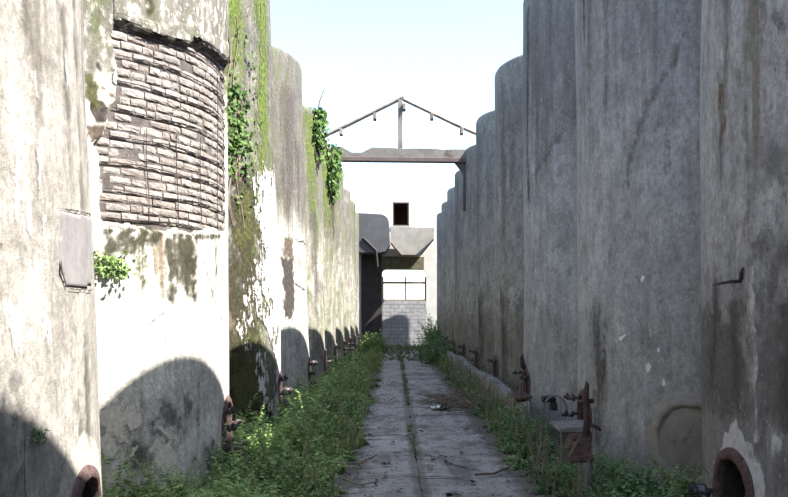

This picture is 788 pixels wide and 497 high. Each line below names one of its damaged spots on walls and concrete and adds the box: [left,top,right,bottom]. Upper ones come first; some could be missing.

spalling [87,0,229,256]
damp [742,0,788,178]
crack [15,435,27,497]
damp [103,226,221,303]
peeling [236,165,295,425]
damp [593,305,605,442]
damp [700,230,788,427]
damp [771,431,782,451]